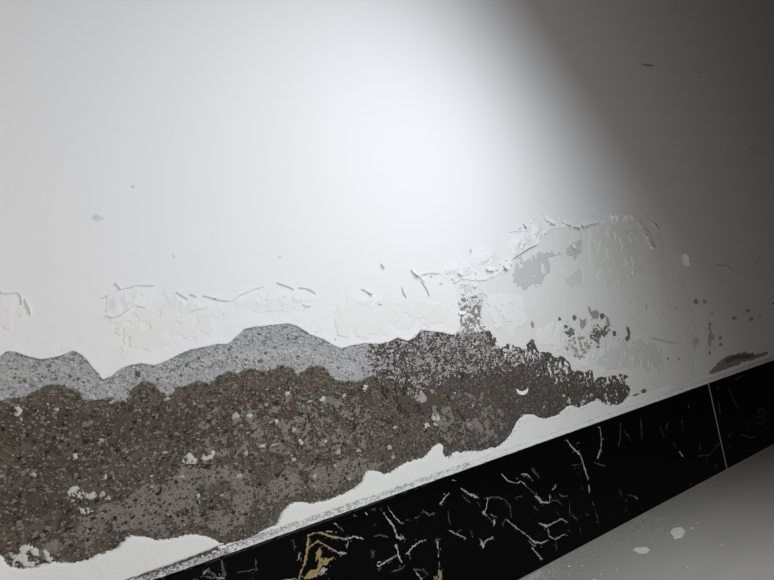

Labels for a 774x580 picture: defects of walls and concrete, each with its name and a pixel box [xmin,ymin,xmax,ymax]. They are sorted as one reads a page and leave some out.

peeling [0,206,696,579]